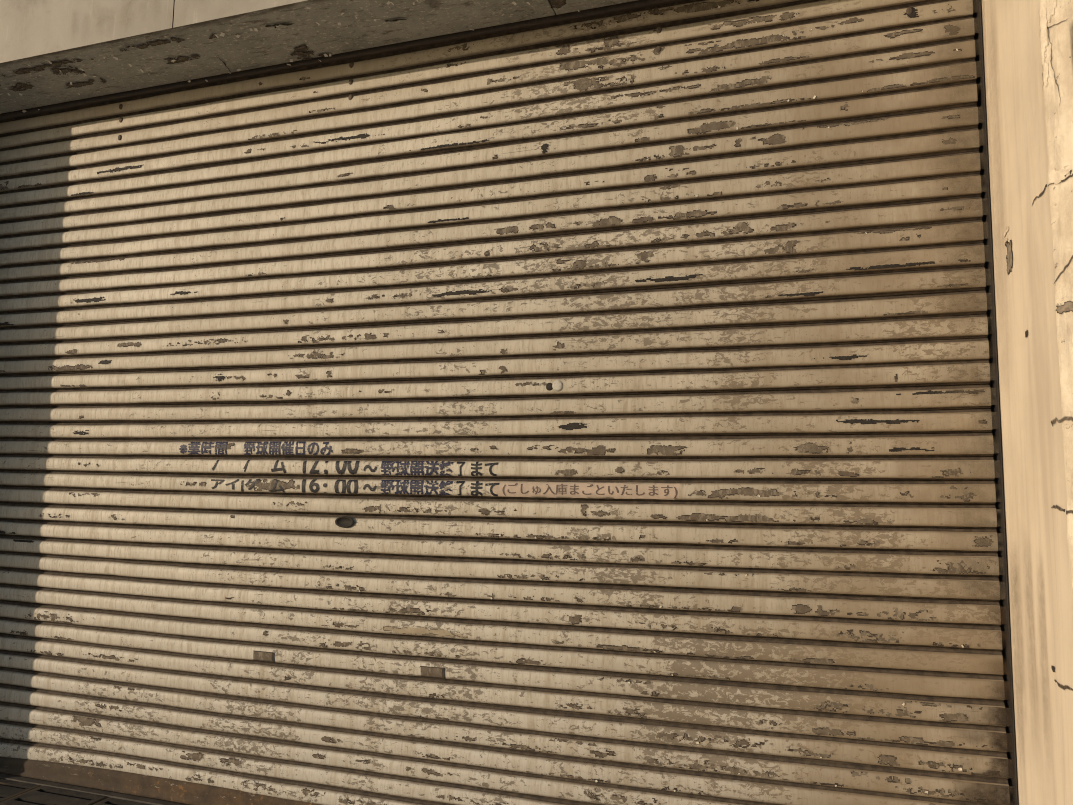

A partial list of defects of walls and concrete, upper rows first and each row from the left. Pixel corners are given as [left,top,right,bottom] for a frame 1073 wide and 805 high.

peeling [686,17,864,55]
peeling [0,38,185,96]
peeling [573,95,888,227]
crack [1032,170,1073,205]
peeling [527,445,616,455]
peeling [650,513,779,523]
crack [1051,505,1073,514]
peeling [314,607,468,638]
peeling [778,587,936,643]
peeling [406,753,452,777]
peeling [408,734,616,761]
peeling [642,727,1000,805]